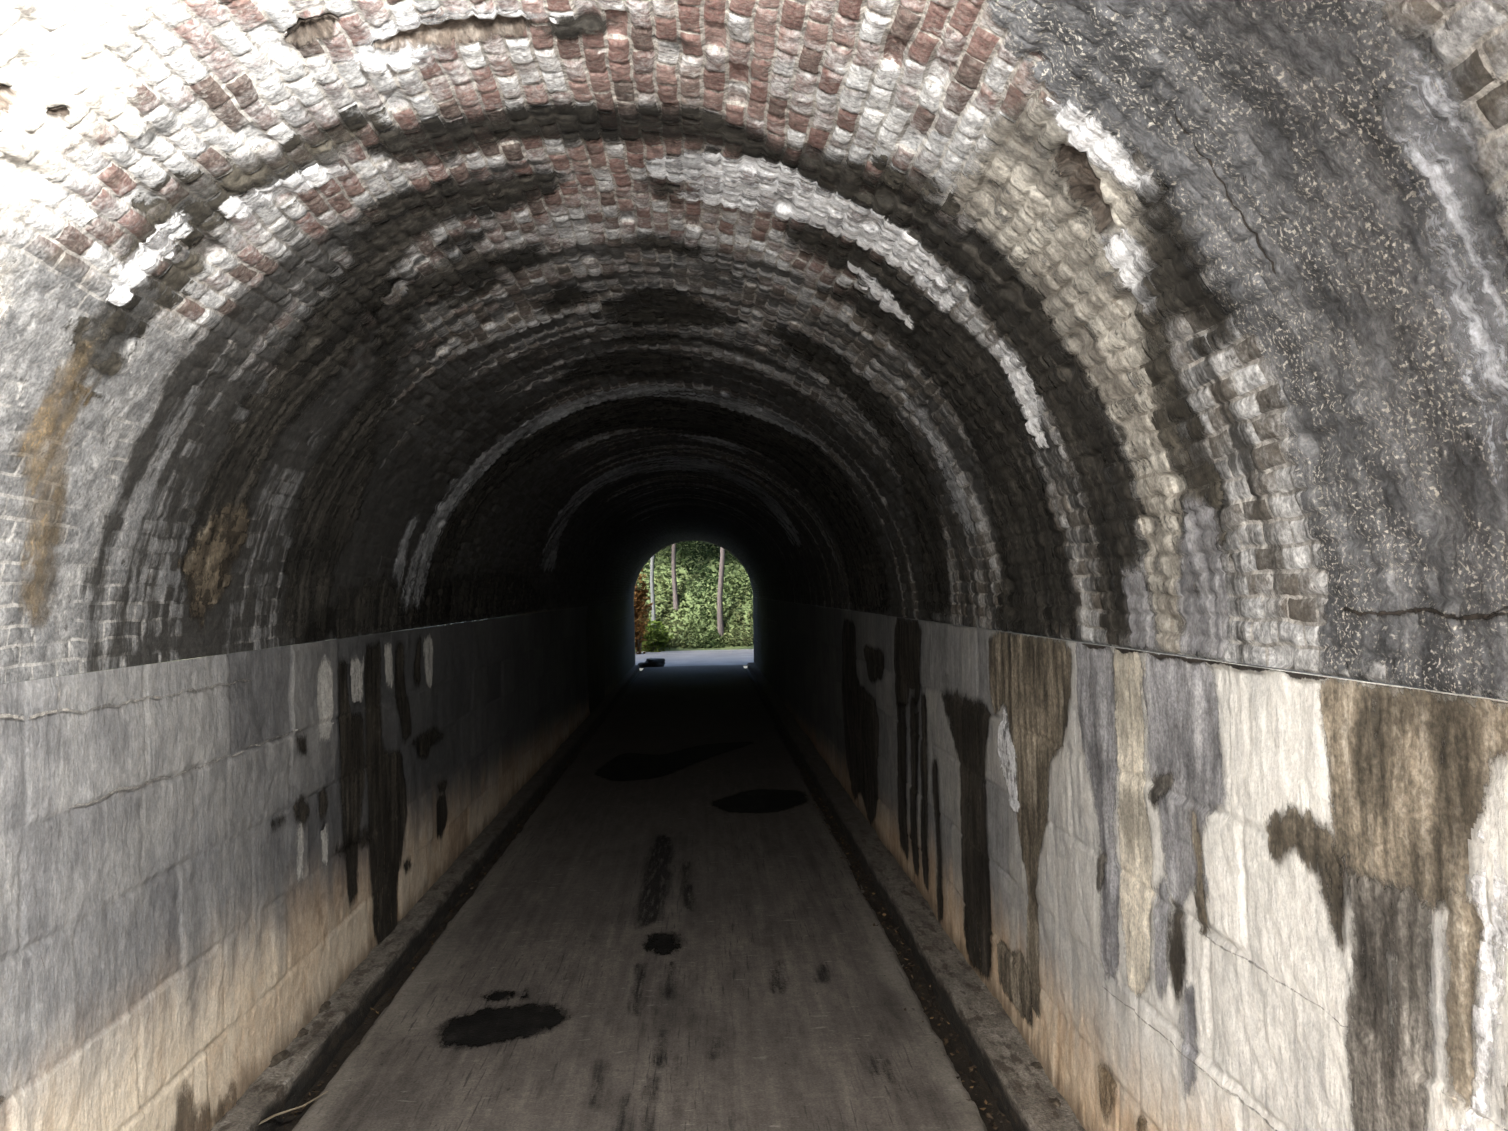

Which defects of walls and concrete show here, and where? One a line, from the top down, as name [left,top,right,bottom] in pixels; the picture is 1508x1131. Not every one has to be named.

spalling [284,13,340,47]
spalling [350,9,556,74]
spalling [0,84,20,120]
damp [219,163,347,219]
damp [645,152,958,329]
damp [530,286,602,315]
damp [1405,71,1508,482]
damp [842,90,1229,1092]
crack [1342,606,1508,620]
damp [271,634,443,945]
damp [437,780,448,839]
damp [1266,677,1508,1131]